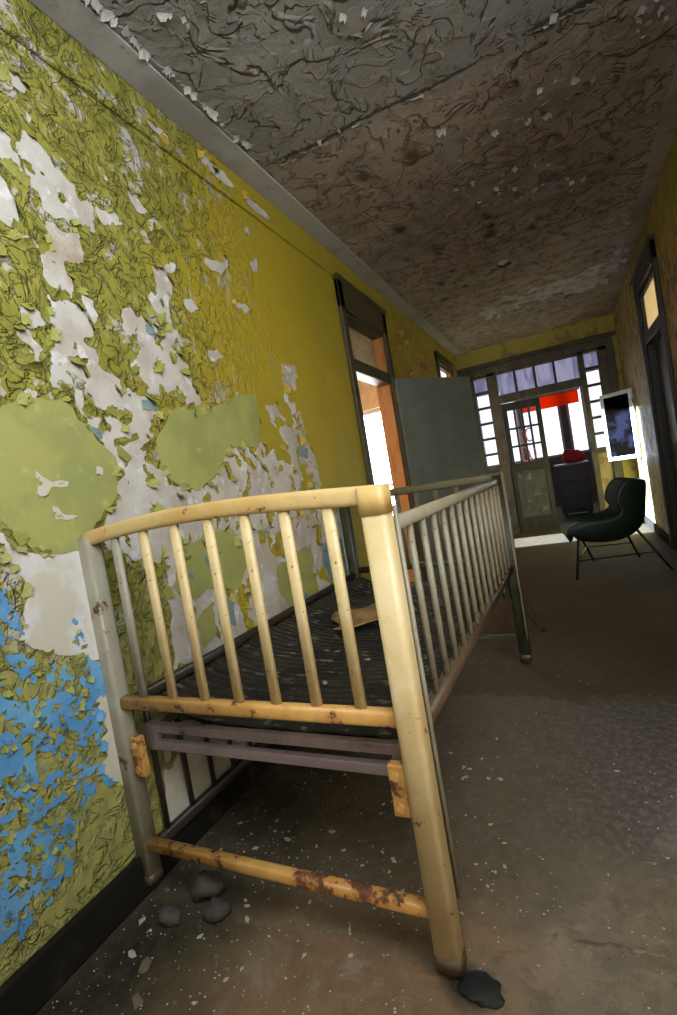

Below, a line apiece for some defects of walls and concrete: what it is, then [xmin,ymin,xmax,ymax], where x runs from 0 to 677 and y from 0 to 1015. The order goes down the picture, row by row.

peeling [0,61,32,94]
peeling [81,0,253,149]
crack [266,51,503,165]
crack [522,0,595,36]
peeling [0,113,333,944]
peeling [335,514,350,584]